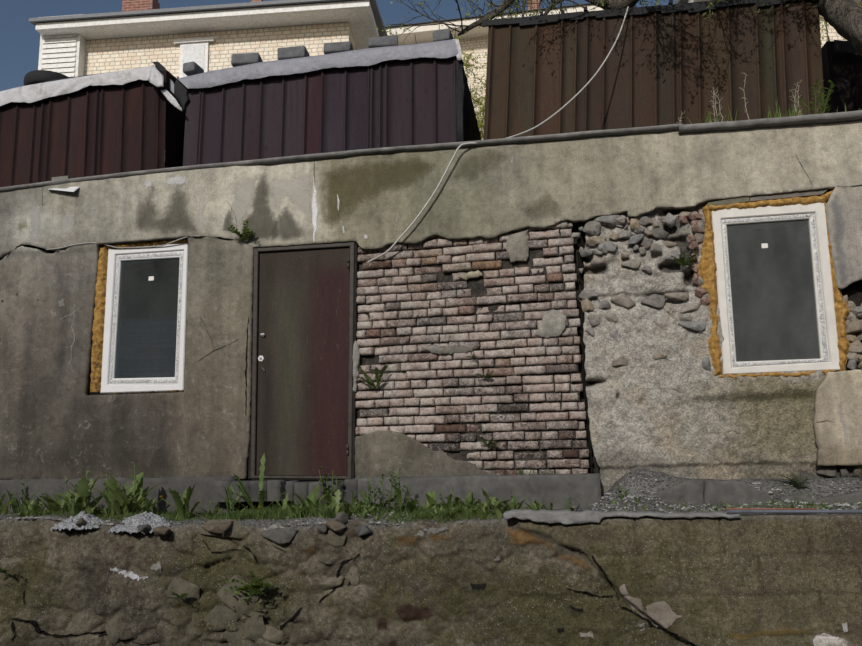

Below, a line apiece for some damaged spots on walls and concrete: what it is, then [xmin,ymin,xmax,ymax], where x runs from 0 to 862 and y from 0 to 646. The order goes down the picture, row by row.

leakage [138,177,204,229]
crack [0,243,95,260]
spalling [353,202,862,495]
crack [567,556,695,646]
peeling [813,622,849,646]